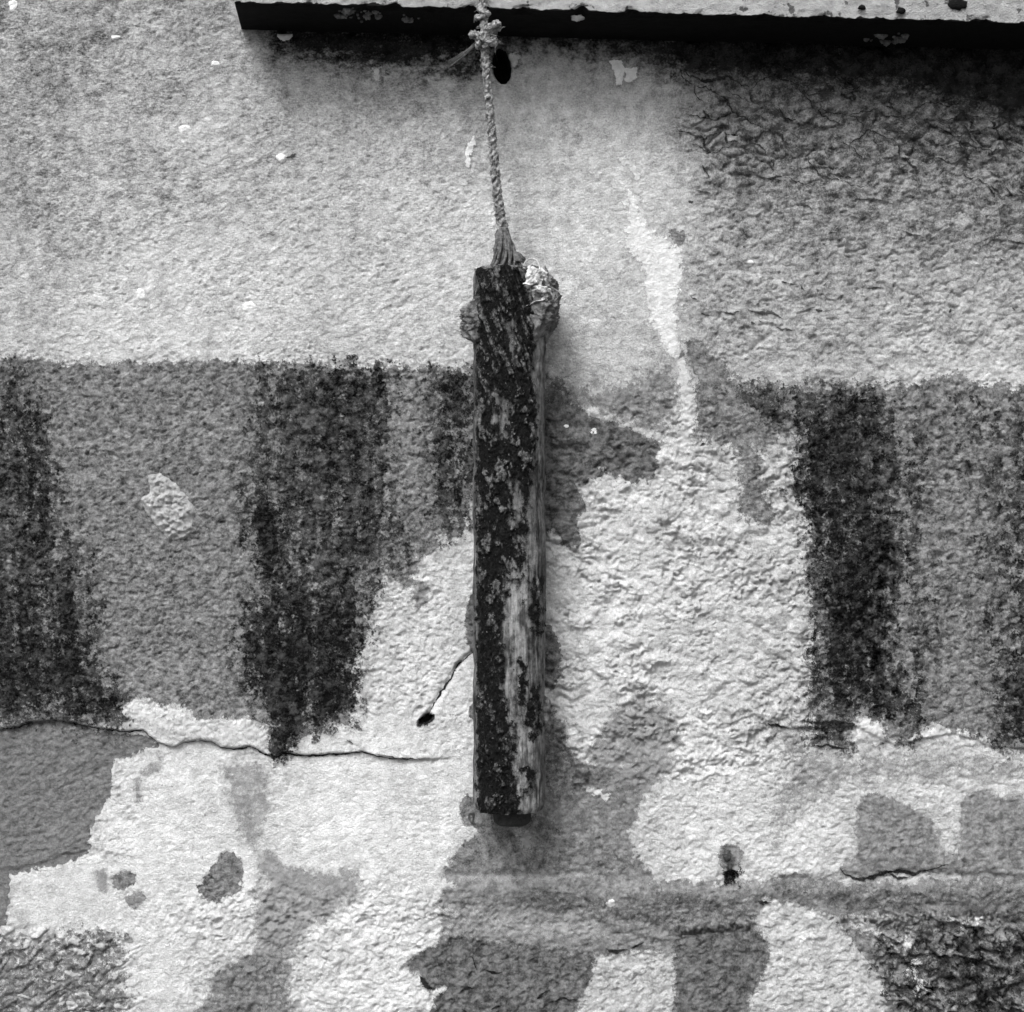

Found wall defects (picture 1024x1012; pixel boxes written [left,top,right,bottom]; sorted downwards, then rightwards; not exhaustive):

crack [678,71,1024,210]
crack [691,297,792,331]
leakage [0,355,474,842]
leakage [404,152,1024,1012]
crack [416,652,473,727]
crack [70,723,417,760]
crack [840,864,947,882]